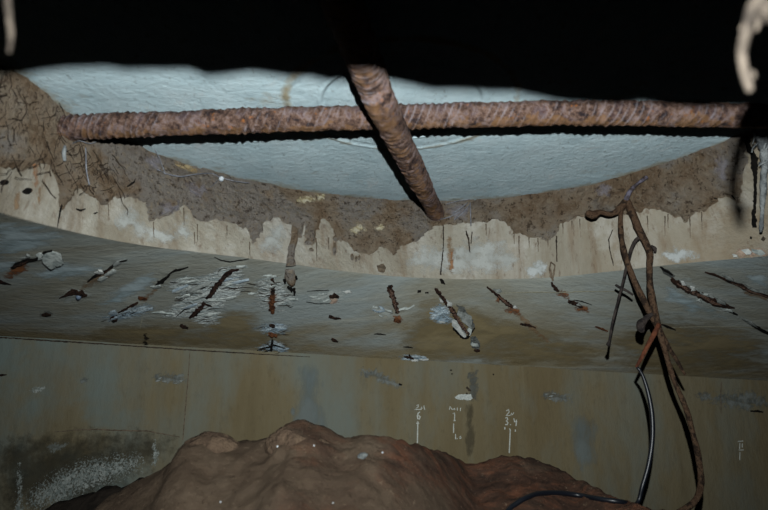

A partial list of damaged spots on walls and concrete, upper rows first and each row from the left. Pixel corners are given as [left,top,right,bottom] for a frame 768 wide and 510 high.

spalling [5,250,64,279]
spalling [732,248,766,258]
spalling [101,265,352,354]
water stain [3,437,159,510]